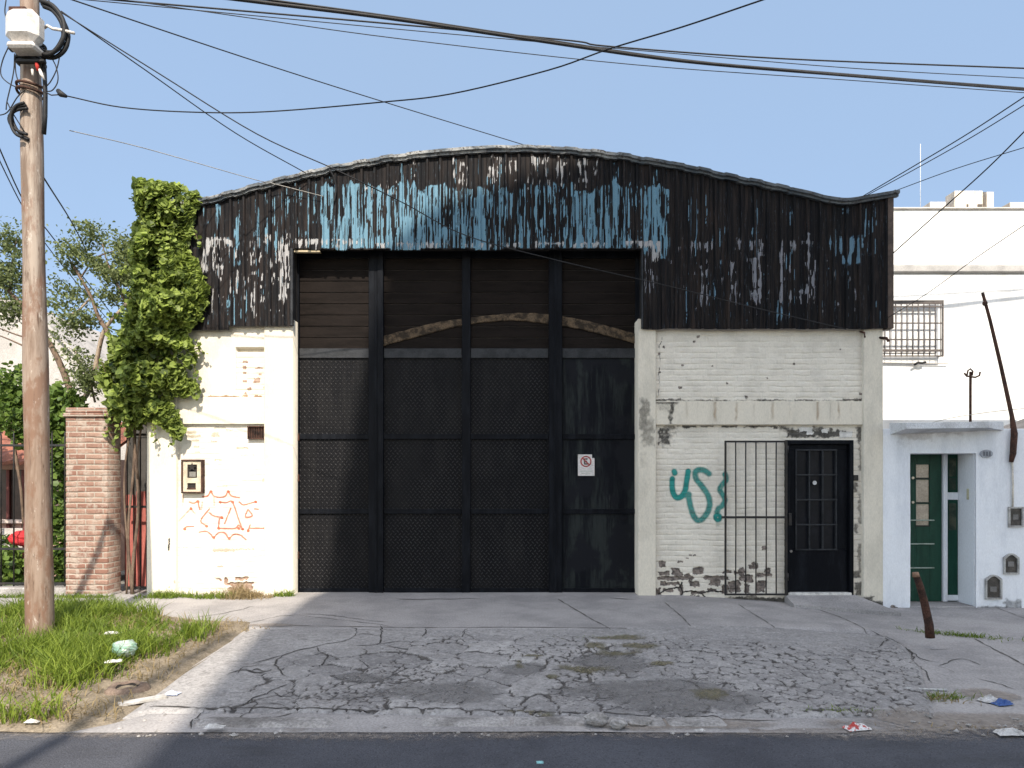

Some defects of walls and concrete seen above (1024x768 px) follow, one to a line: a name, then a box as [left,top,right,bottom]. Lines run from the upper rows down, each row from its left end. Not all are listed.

peeling [201,156,725,324]
peeling [720,208,877,320]
peeling [243,360,264,394]
peeling [799,426,861,442]
peeling [656,554,772,596]
crack [163,606,1013,728]